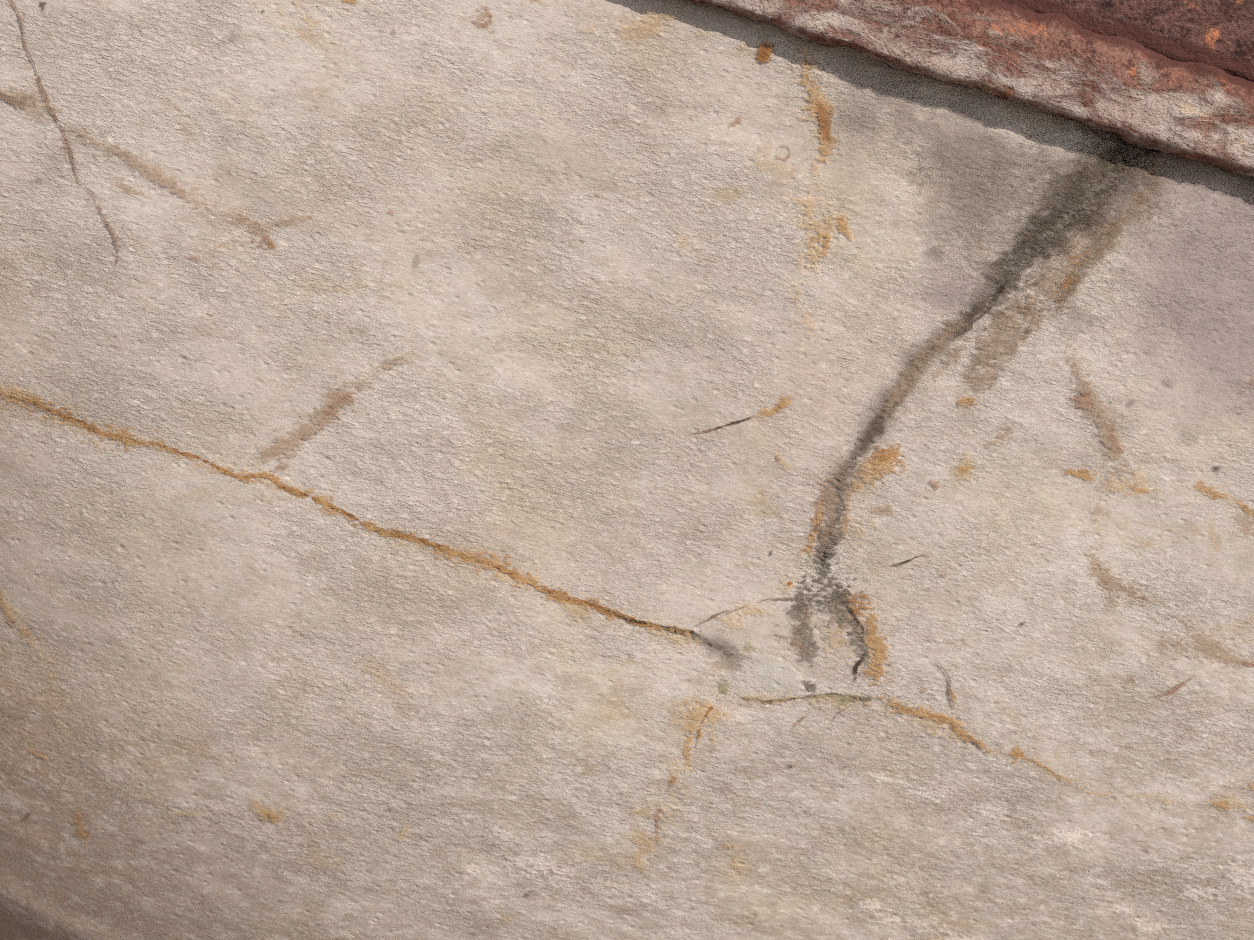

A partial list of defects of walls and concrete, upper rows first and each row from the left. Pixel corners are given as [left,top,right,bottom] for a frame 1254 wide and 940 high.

corrosion [754,42,776,64]
corrosion [799,55,840,161]
corrosion [807,214,853,267]
damp [927,123,1254,413]
damp [1071,362,1126,458]
crack [0,170,1117,795]
damp [1092,562,1143,606]